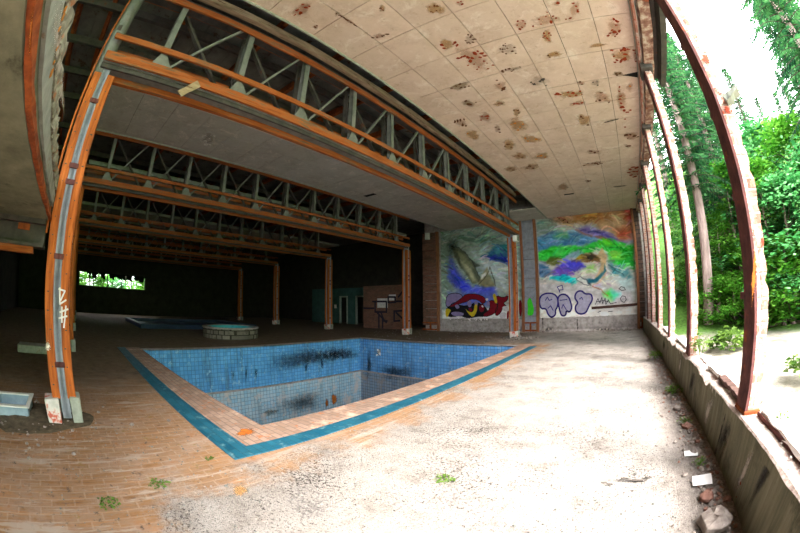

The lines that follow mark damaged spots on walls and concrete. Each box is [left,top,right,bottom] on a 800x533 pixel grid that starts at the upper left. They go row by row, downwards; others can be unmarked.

spalling [49,0,78,192]
corrosion [595,85,639,147]
leakage [281,350,351,370]
leakage [291,395,313,408]